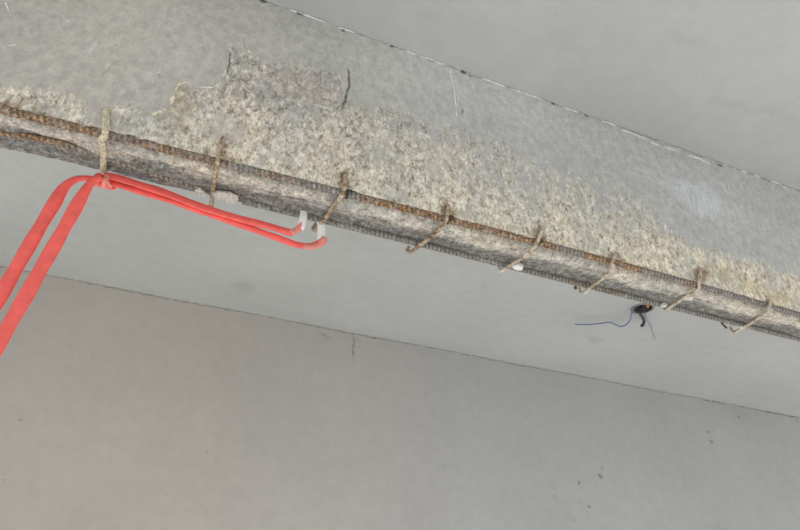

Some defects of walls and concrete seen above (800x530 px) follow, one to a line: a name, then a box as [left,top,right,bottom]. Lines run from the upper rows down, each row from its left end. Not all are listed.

spalling [0,36,800,342]